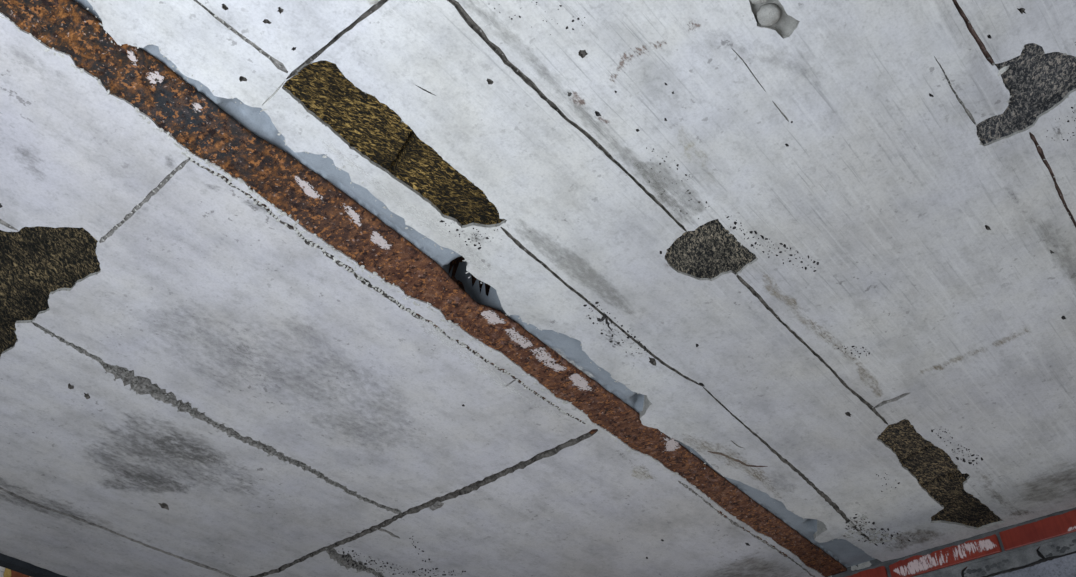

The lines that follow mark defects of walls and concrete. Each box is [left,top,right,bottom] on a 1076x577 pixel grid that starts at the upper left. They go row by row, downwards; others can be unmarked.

crack [732,49,789,122]
crack [934,56,976,124]
spalling [975,43,1076,146]
crack [181,152,588,426]
spalling [0,0,832,577]
crack [597,314,612,331]
crack [30,321,403,538]
crack [707,441,768,467]
spalling [674,439,875,571]
crack [872,393,910,408]
spalling [877,419,1006,530]
crack [325,547,385,577]